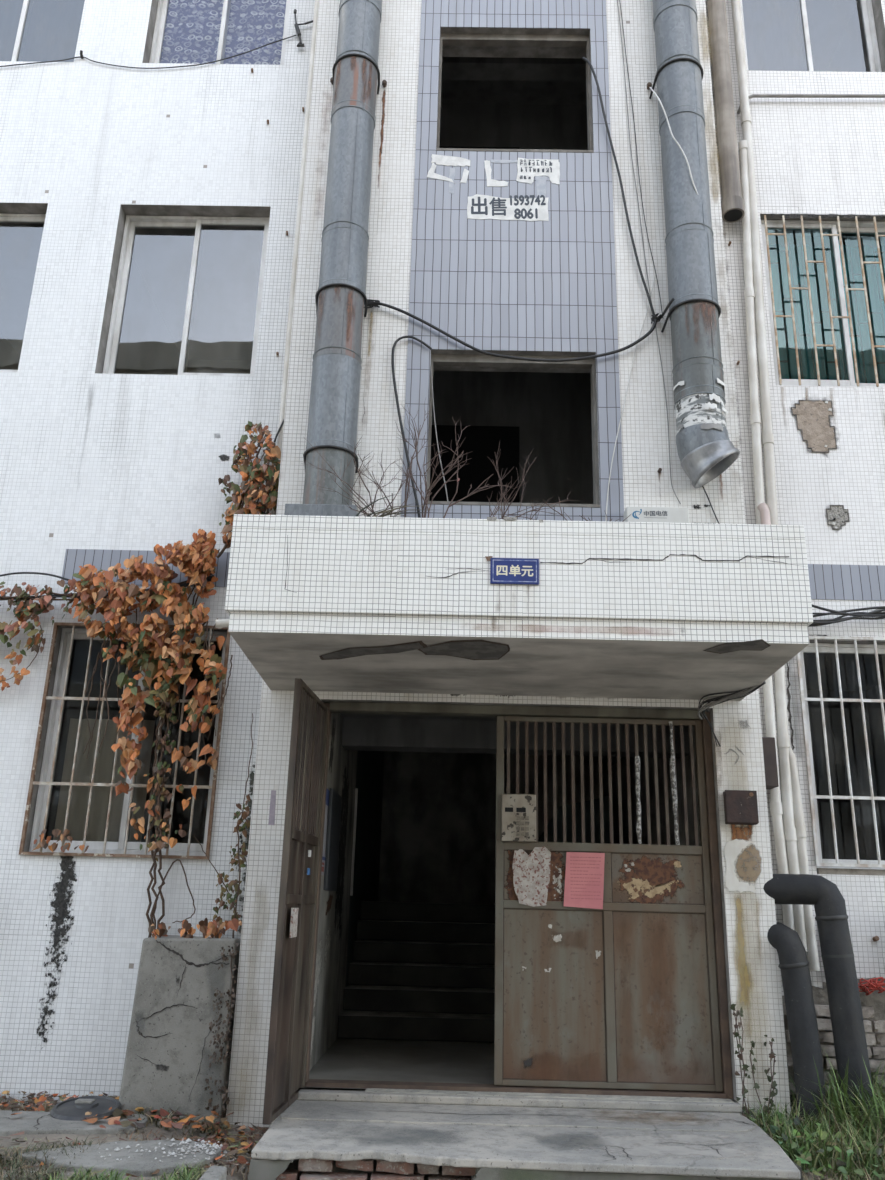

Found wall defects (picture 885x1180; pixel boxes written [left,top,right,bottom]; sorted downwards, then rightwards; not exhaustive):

corrosion [335,56,386,186]
spalling [791,400,837,456]
spalling [826,505,850,530]
crack [540,554,805,567]
flaking render [723,839,761,893]
crack [134,940,229,1099]
crack [399,1109,509,1117]
crack [666,1119,755,1179]